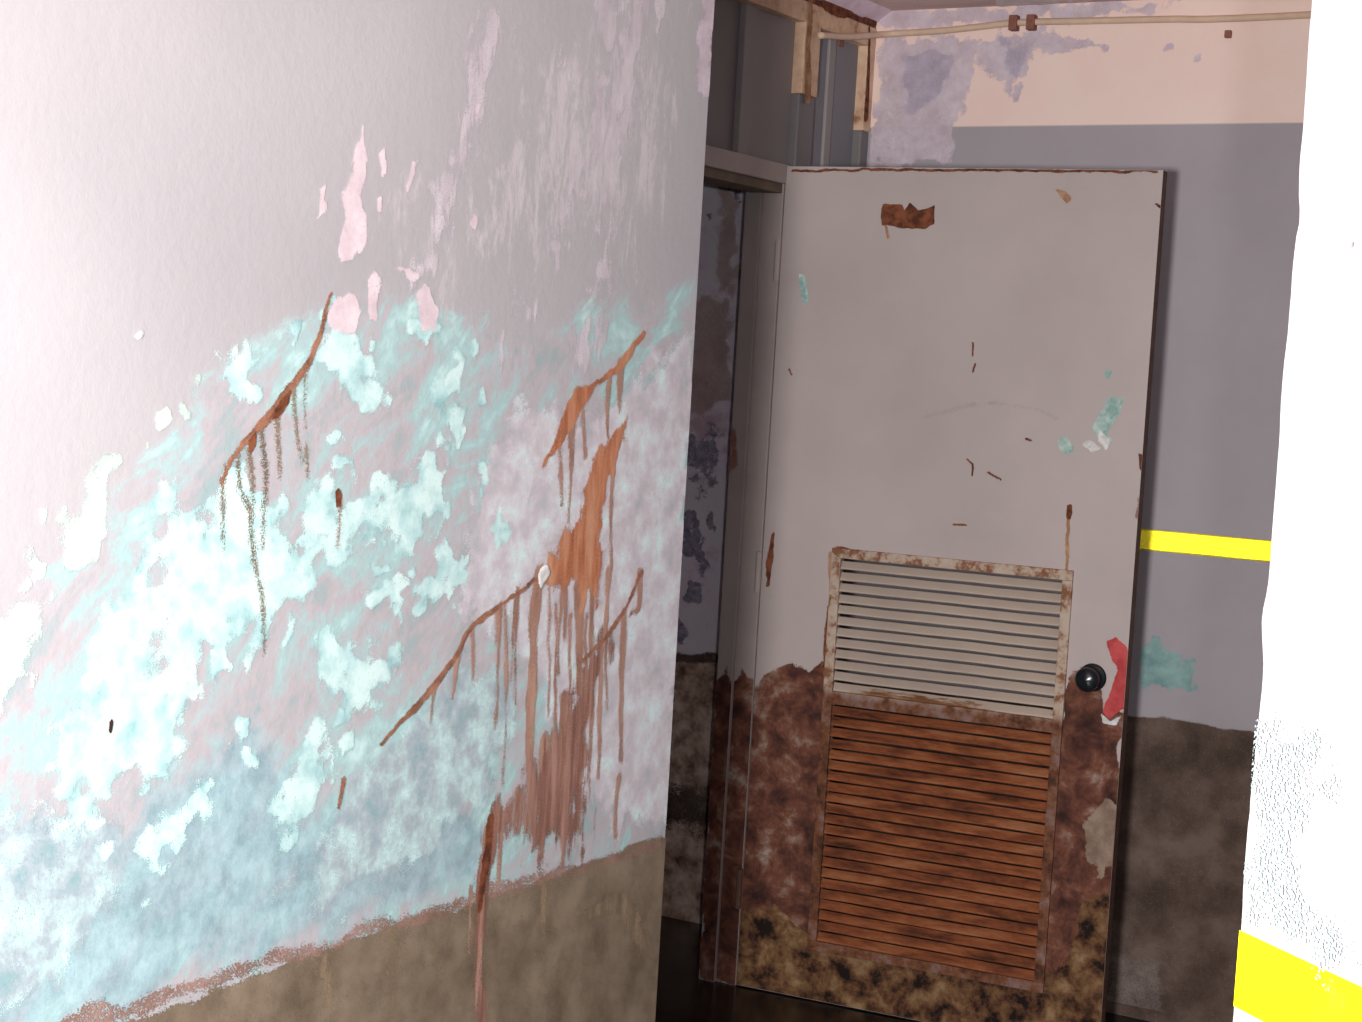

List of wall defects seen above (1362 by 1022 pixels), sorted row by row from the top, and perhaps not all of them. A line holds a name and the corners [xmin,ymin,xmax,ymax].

peeling [693,0,715,100]
corrosion [805,0,877,122]
peeling [869,0,1179,167]
peeling [317,125,387,263]
corrosion [880,203,935,239]
peeling [315,271,393,417]
peeling [397,266,442,346]
corrosion [218,292,332,657]
corrosion [335,488,343,547]
peeling [0,325,728,1016]
corrosion [379,330,645,1022]
corrosion [699,546,1123,1022]